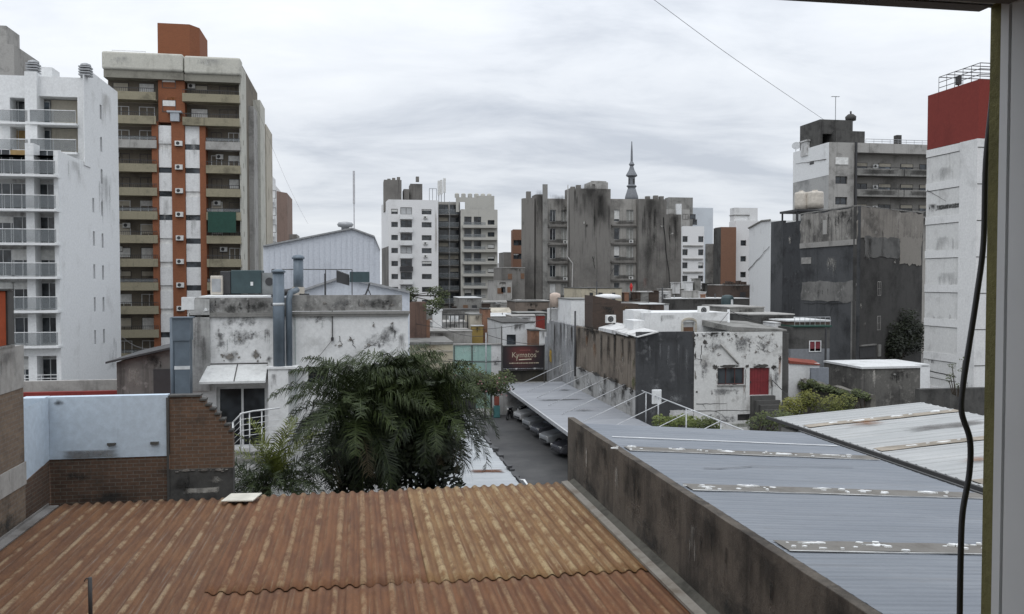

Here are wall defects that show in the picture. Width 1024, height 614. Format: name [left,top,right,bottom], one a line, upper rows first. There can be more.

leakage [210,301,272,346]
peeling [692,331,781,393]